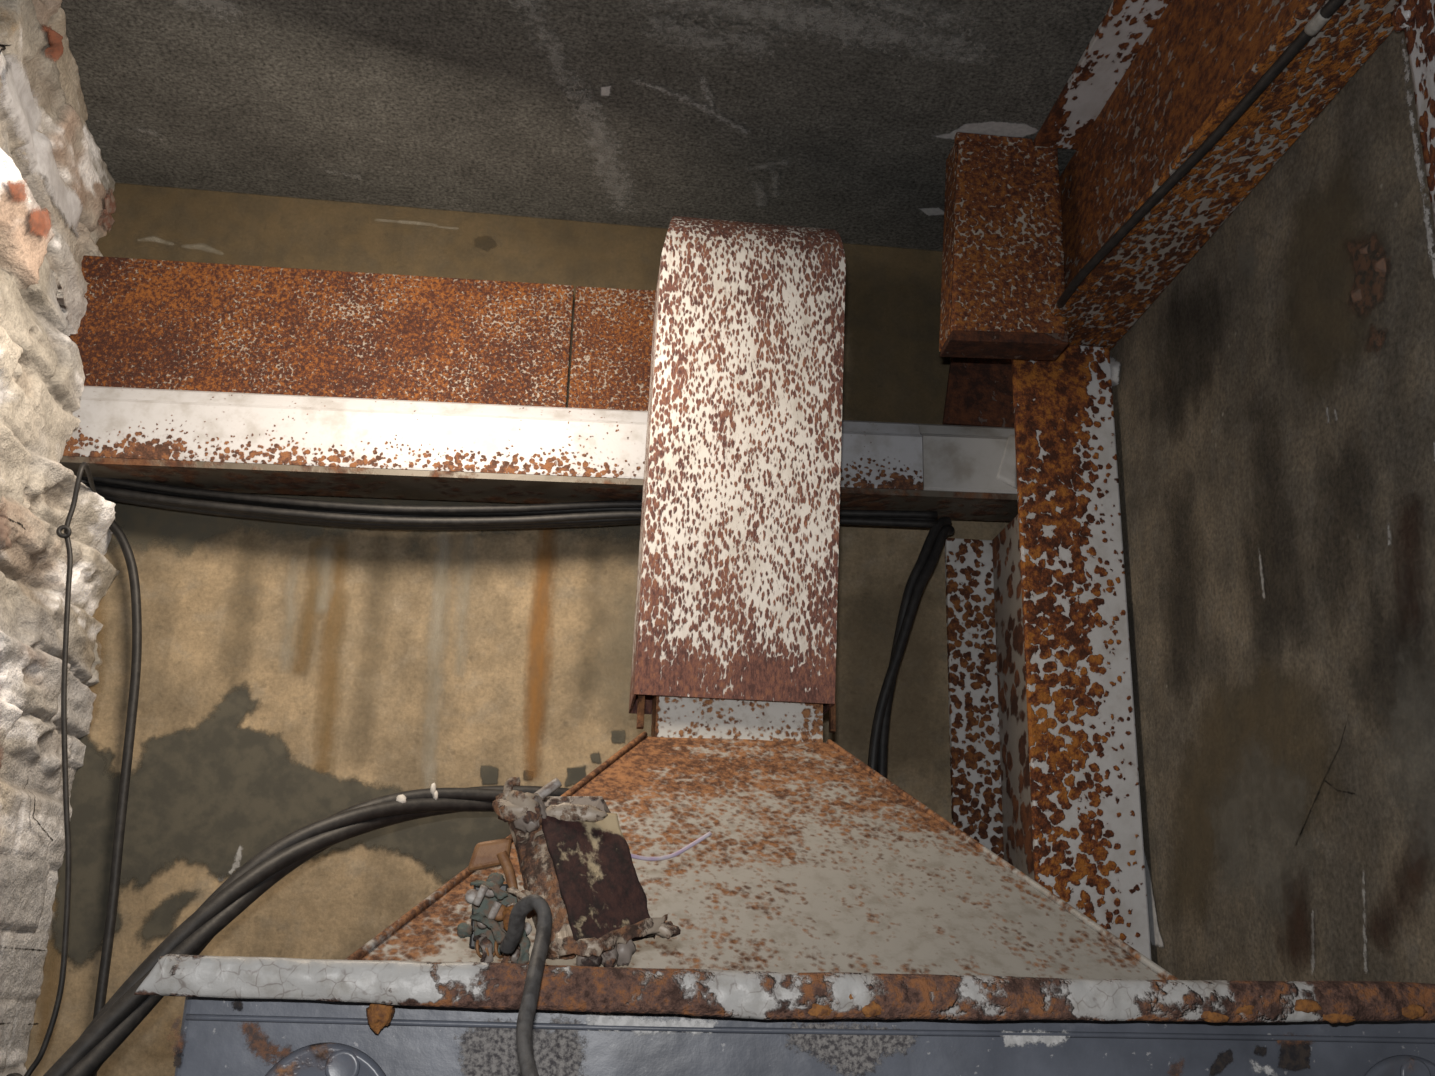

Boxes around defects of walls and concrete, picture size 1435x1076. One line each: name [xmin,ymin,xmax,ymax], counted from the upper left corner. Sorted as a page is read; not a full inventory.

peeling [1402,40,1435,278]
damp [480,765,499,784]
damp [51,684,403,965]
damp [313,812,511,882]
rust [808,1003,833,1018]
rust [849,994,882,1017]
rust [1201,1005,1255,1023]
rust [1294,999,1355,1024]
rust [1402,1004,1427,1019]